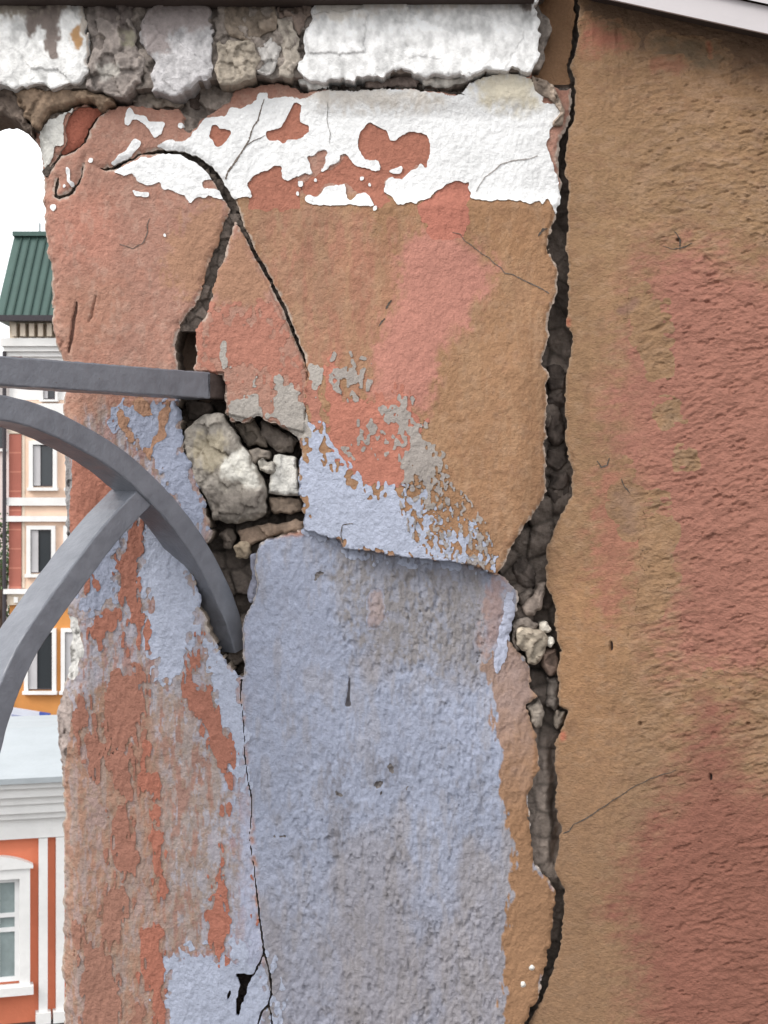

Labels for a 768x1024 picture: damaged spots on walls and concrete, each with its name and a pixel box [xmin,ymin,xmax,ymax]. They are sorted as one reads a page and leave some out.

spalling [39,107,103,188]
crack [42,100,307,369]
peeling [111,82,561,240]
peeling [64,456,112,536]
peeling [107,298,498,627]
crack [453,0,675,1024]
peeling [57,519,288,1024]
crack [241,679,252,818]
crack [251,848,273,1024]
peeling [477,592,556,1024]